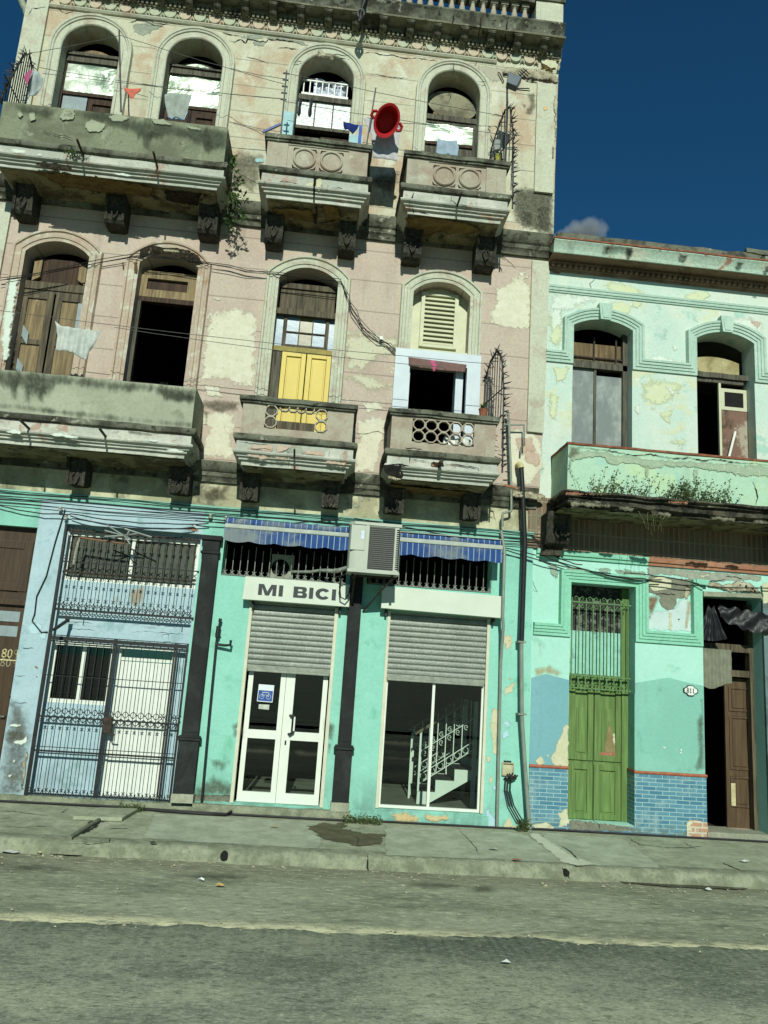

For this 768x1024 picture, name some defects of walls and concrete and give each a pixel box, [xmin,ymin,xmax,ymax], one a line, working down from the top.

water stain [19,104,51,115]
water stain [87,111,226,150]
water stain [514,189,553,233]
peeling [1,277,18,362]
peeling [488,272,531,330]
peeling [200,297,259,397]
water stain [0,371,135,413]
water stain [149,386,193,400]
peeling [202,411,236,459]
peeling [503,428,545,509]
peeling [550,565,768,632]
peeling [536,725,569,766]